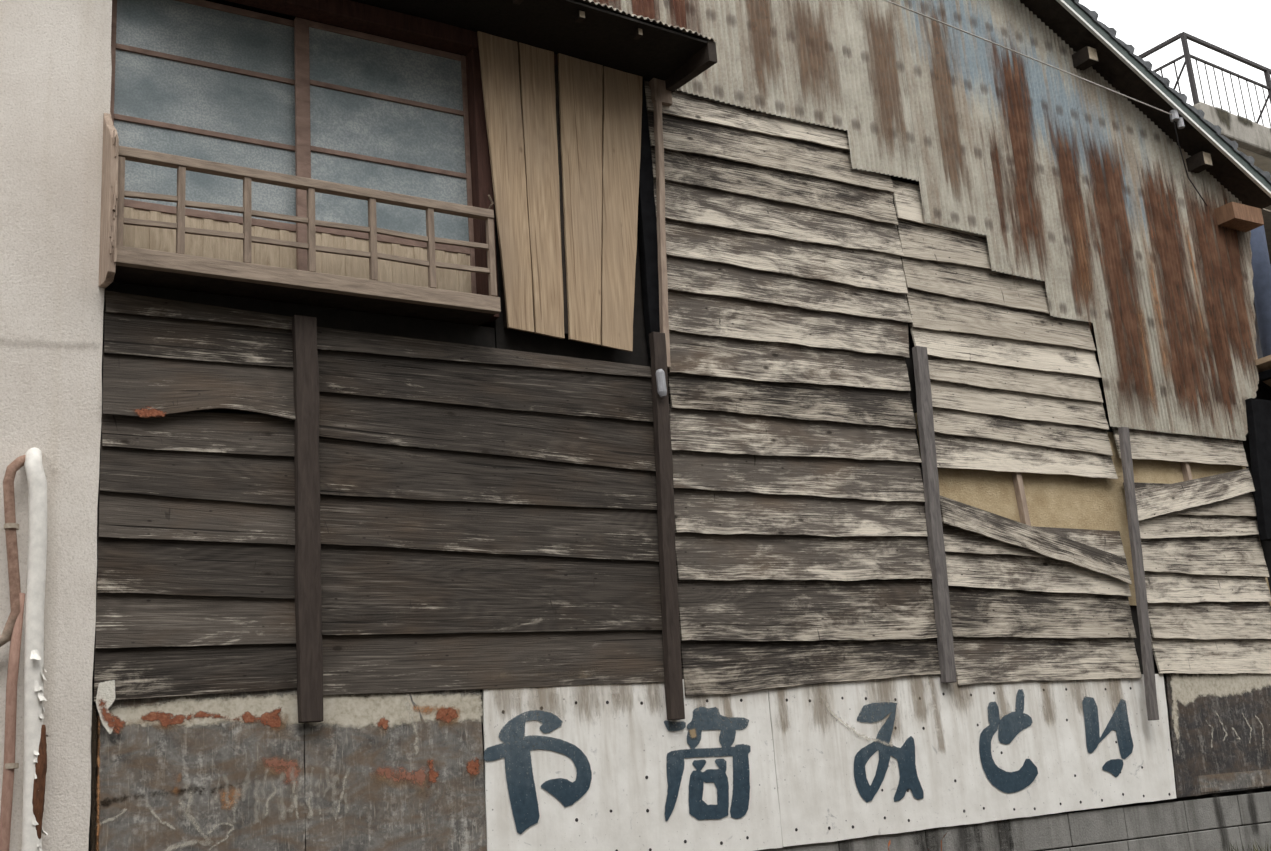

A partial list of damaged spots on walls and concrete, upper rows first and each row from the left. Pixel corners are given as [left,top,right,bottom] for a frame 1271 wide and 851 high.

corrosion [746,0,779,95]
corrosion [787,0,840,95]
corrosion [866,6,907,142]
corrosion [927,8,963,193]
corrosion [990,41,1255,429]
corrosion [135,407,166,417]
corrosion [141,708,284,730]
corrosion [413,706,459,723]